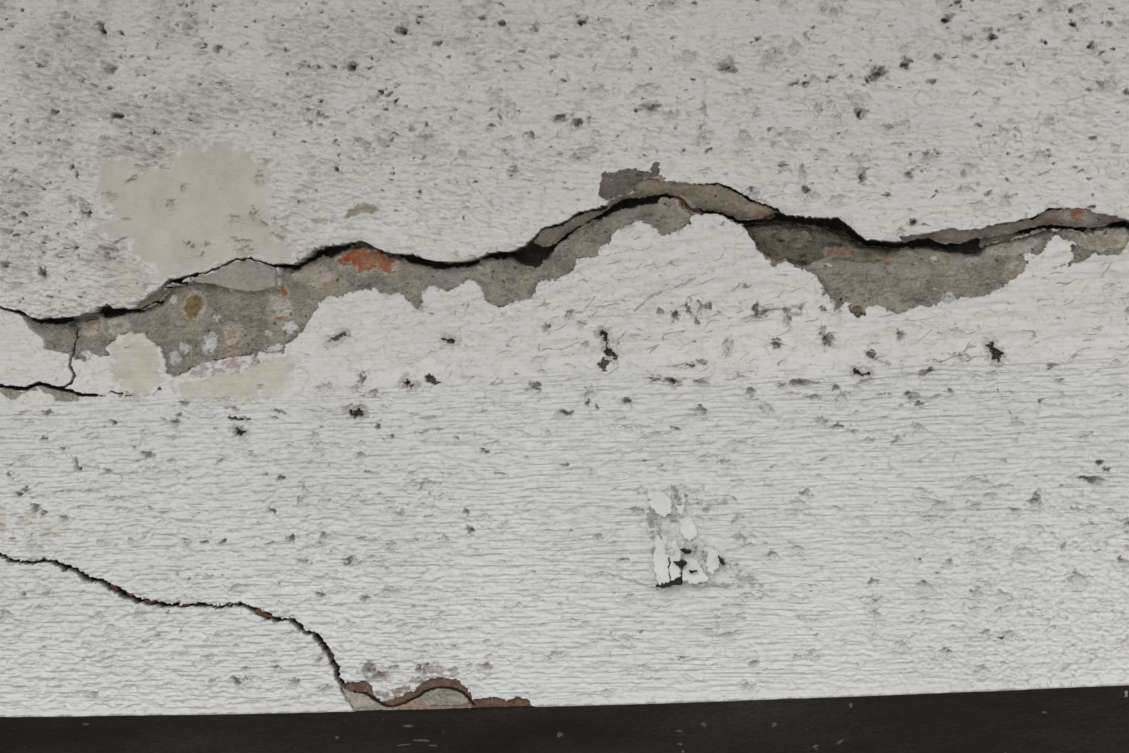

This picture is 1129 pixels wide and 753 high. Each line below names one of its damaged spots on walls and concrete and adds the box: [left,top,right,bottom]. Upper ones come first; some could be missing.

crack [243,176,1129,271]
crack [12,273,207,338]
flaking render [28,162,692,436]
crack [632,275,698,314]
crack [738,298,810,322]
flaking render [742,217,1129,318]
crack [862,347,893,367]
flaking render [985,341,1003,362]
crack [0,382,131,396]
crack [0,552,346,685]
flaking render [341,656,532,712]